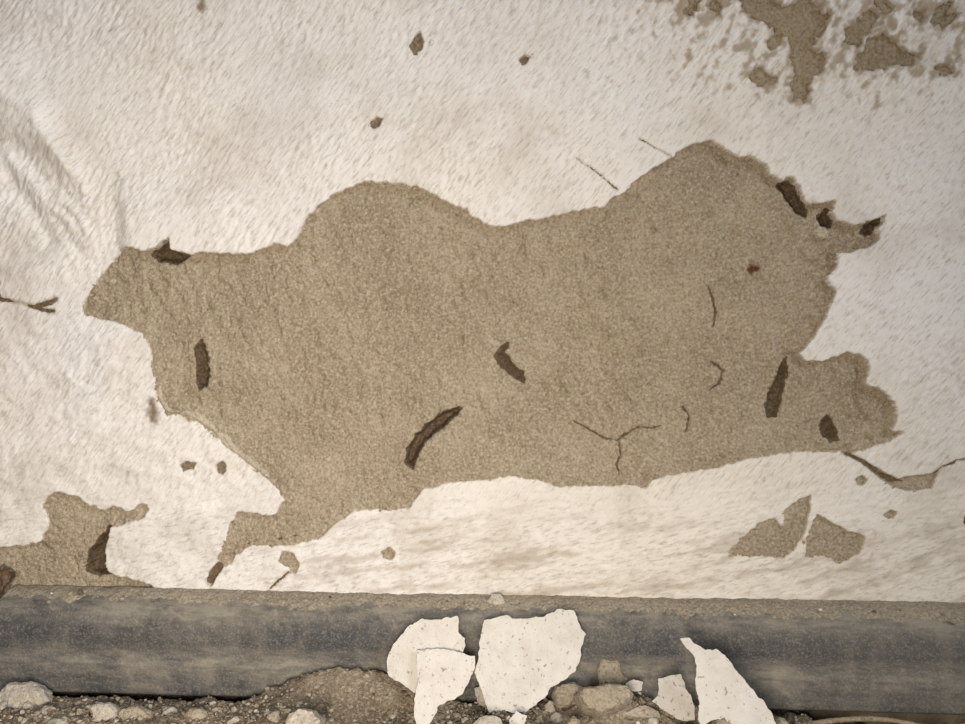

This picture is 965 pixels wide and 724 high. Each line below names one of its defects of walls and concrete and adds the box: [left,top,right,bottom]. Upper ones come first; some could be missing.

peeling [683,0,722,16]
peeling [739,0,829,103]
peeling [843,0,915,71]
peeling [912,2,956,28]
peeling [934,66,953,76]
crack [0,297,57,313]
flaking render [83,143,936,574]
flaking render [0,492,153,598]